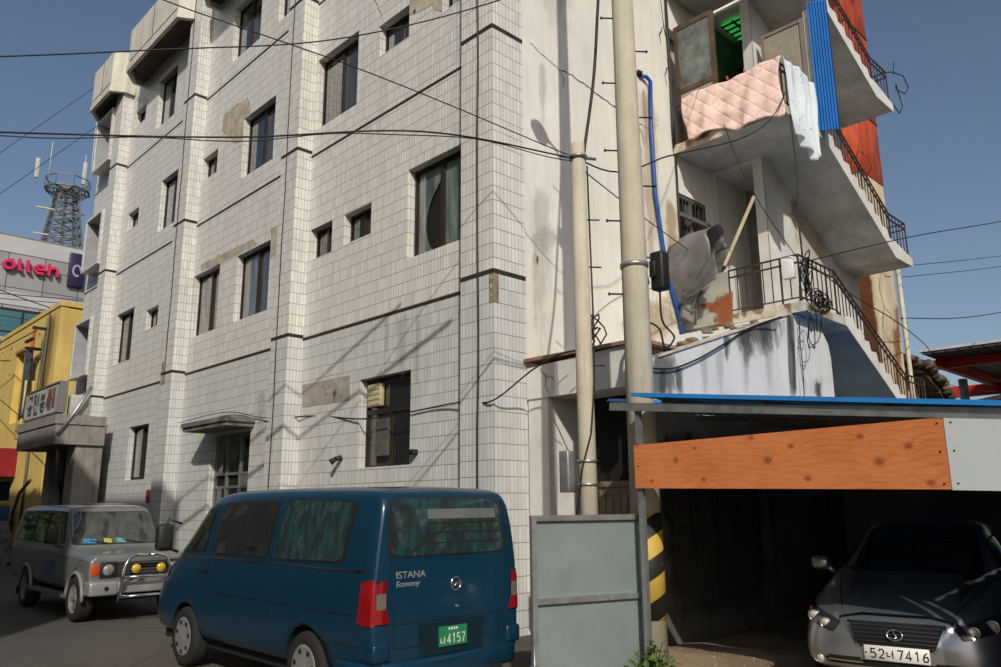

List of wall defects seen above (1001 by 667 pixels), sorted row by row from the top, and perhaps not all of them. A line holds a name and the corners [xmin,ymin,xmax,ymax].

peeling [410,0,443,15]
crack [530,43,615,107]
peeling [222,97,251,151]
corrosion [700,291,733,327]